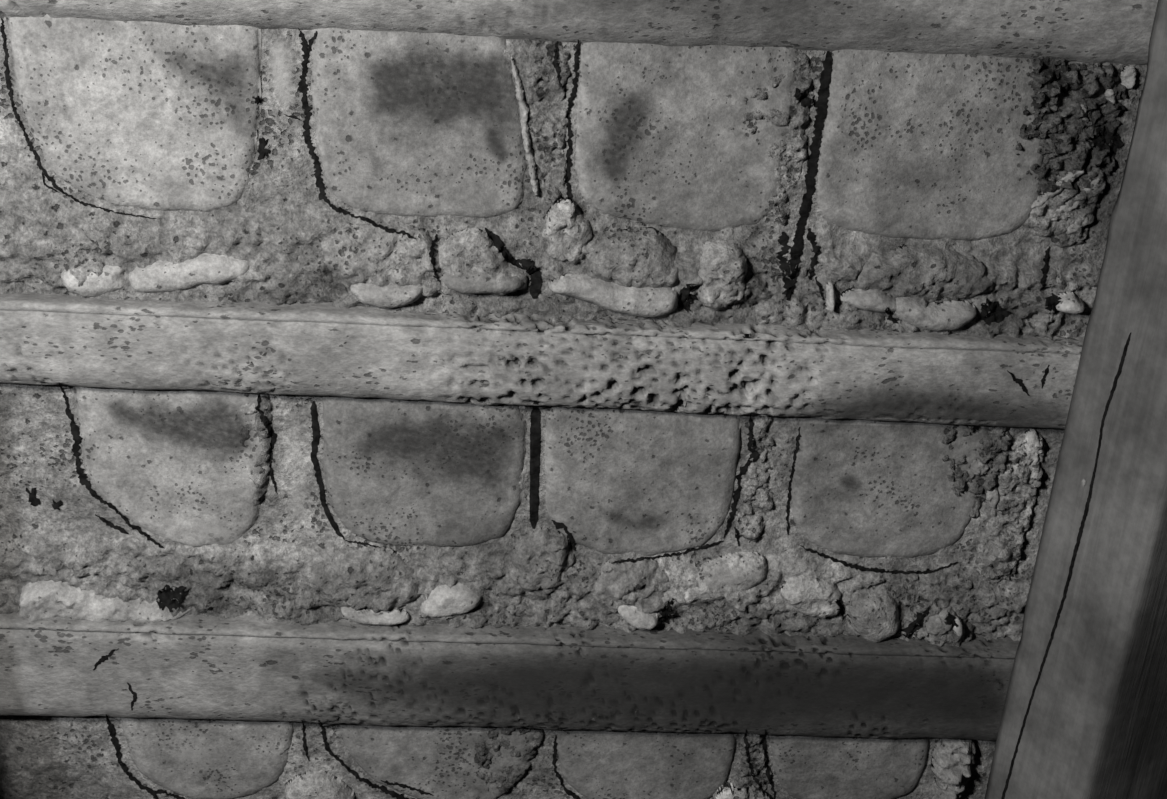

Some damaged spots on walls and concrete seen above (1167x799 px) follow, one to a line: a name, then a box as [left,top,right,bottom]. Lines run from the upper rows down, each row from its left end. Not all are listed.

leakage [374,54,502,118]
leakage [603,96,642,176]
leakage [114,407,245,452]
leakage [365,418,505,485]
crack [1001,333,1131,799]